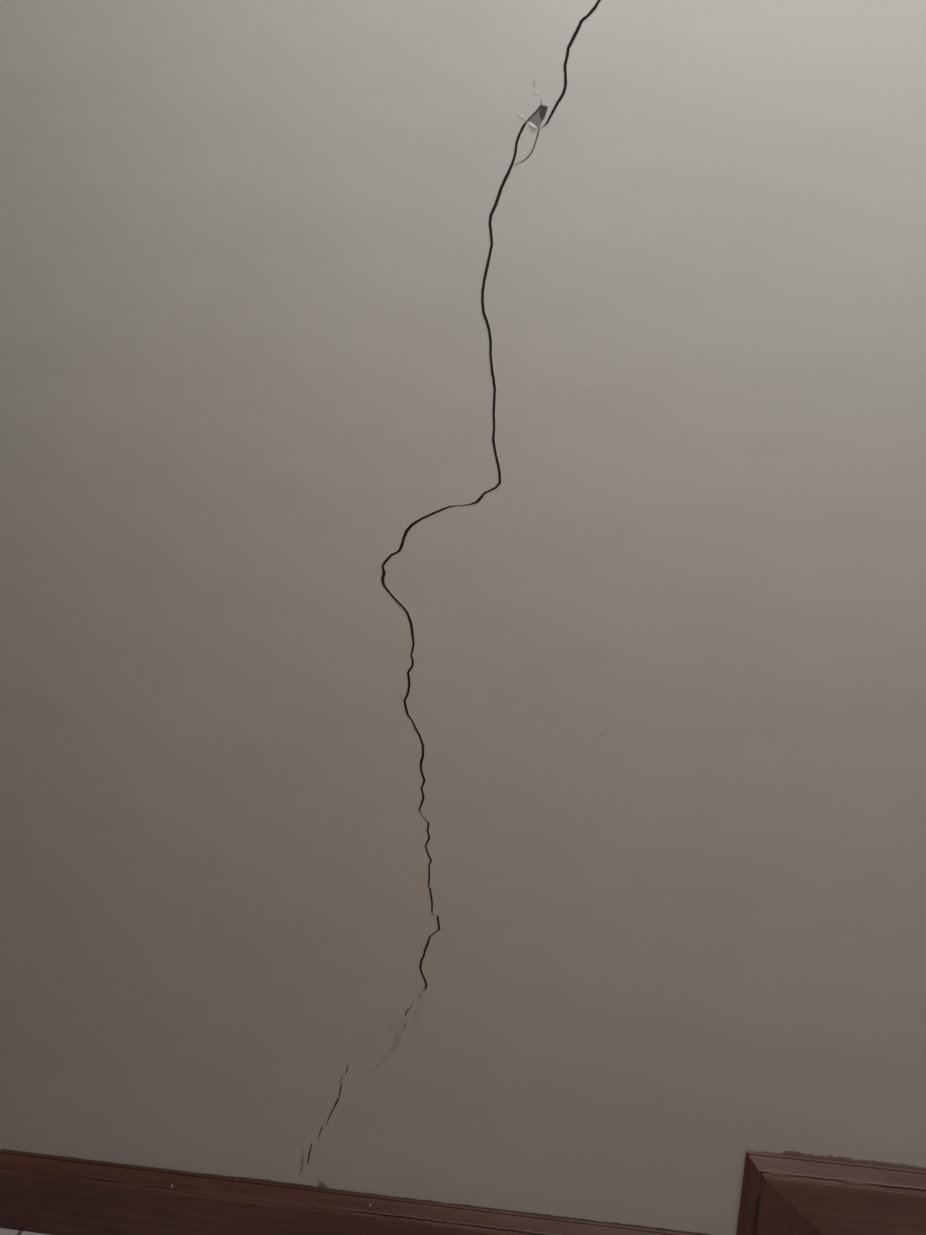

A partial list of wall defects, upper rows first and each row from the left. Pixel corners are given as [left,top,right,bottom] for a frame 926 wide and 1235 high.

crack [380,0,603,1015]
crack [308,1066,348,1163]